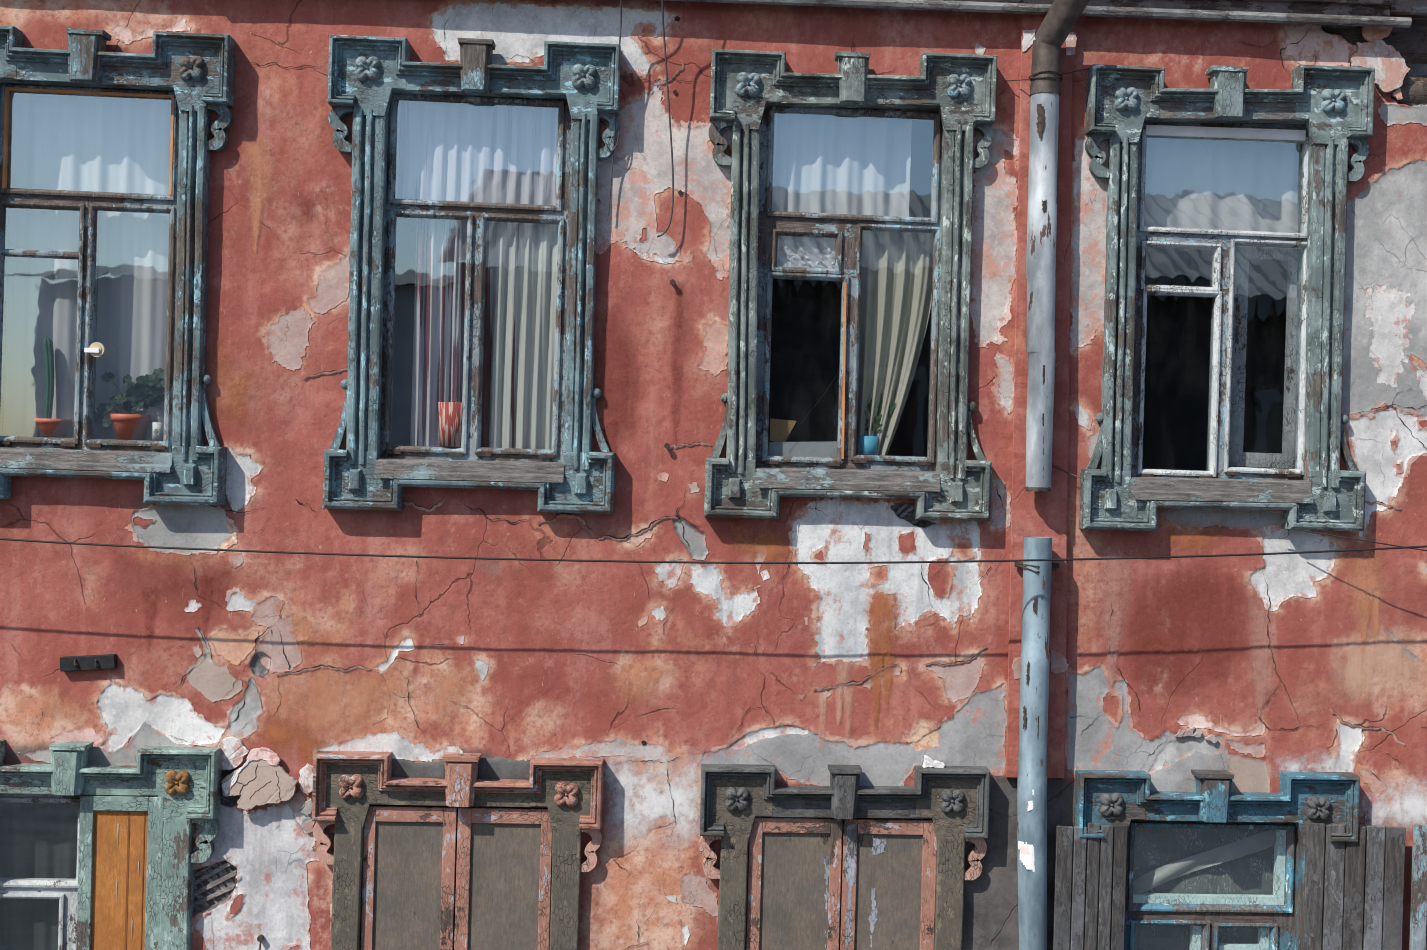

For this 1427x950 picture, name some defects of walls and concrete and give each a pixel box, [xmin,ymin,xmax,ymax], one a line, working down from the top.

flaking render [430,0,732,280]
flaking render [1341,159,1427,539]
crack [230,764,281,829]
flaking render [191,768,333,950]
crack [130,552,419,744]
flaking render [788,477,1011,689]
flaking render [1050,650,1270,793]
flaking render [1162,508,1341,611]
crack [1257,566,1427,782]